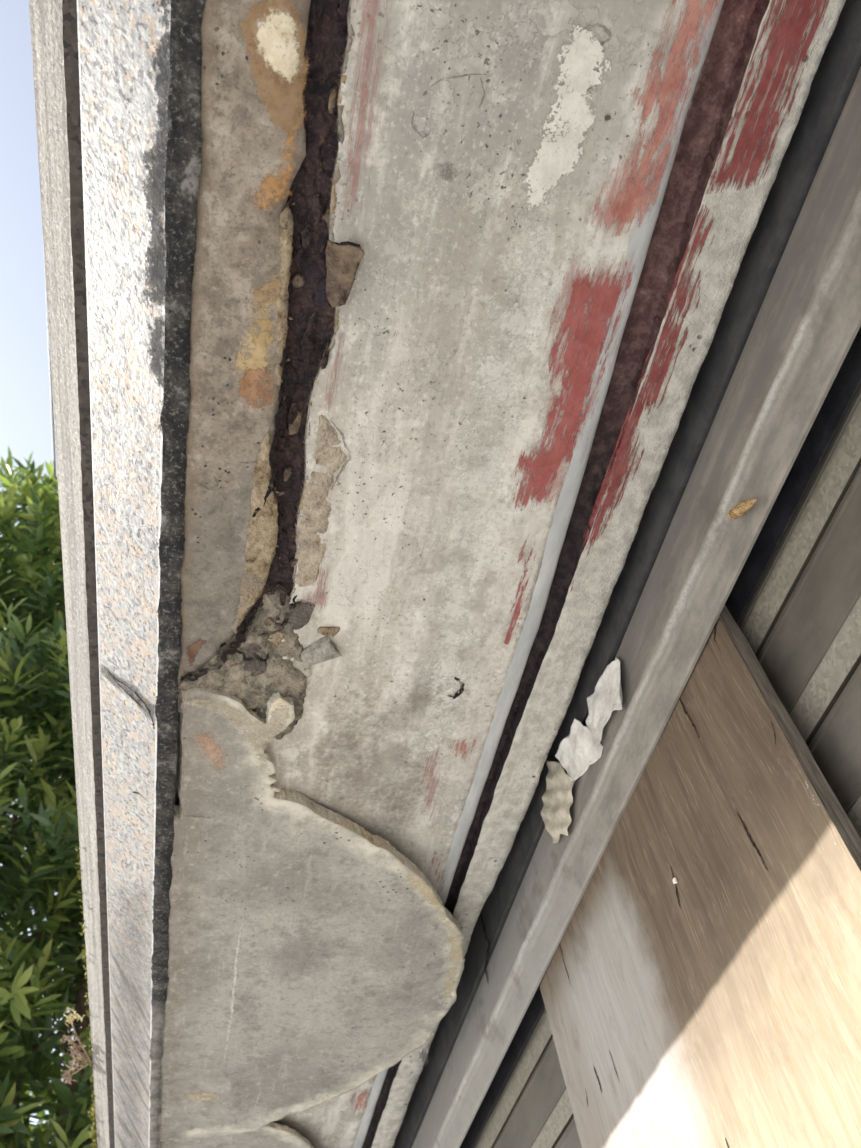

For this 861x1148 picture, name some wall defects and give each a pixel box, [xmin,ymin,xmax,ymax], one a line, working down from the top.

peeling [579,0,829,556]
crack [252,348,287,521]
spalling [178,0,381,740]
crack [102,665,154,729]
crack [180,595,297,682]